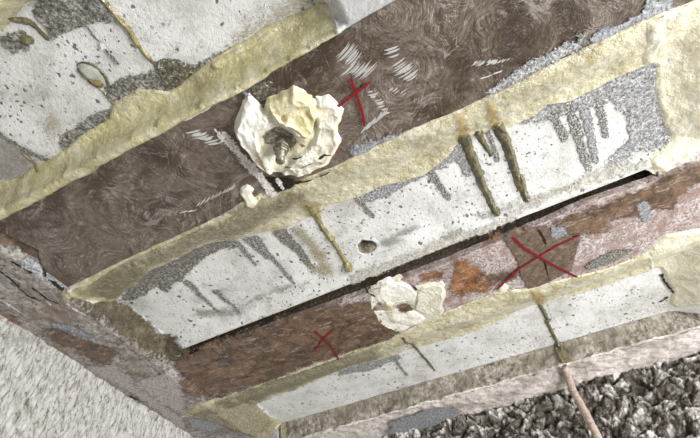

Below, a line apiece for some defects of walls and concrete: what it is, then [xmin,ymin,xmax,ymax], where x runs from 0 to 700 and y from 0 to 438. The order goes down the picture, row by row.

crack [0,261,64,304]
corrosion [420,254,519,300]
corrosion [398,303,413,313]